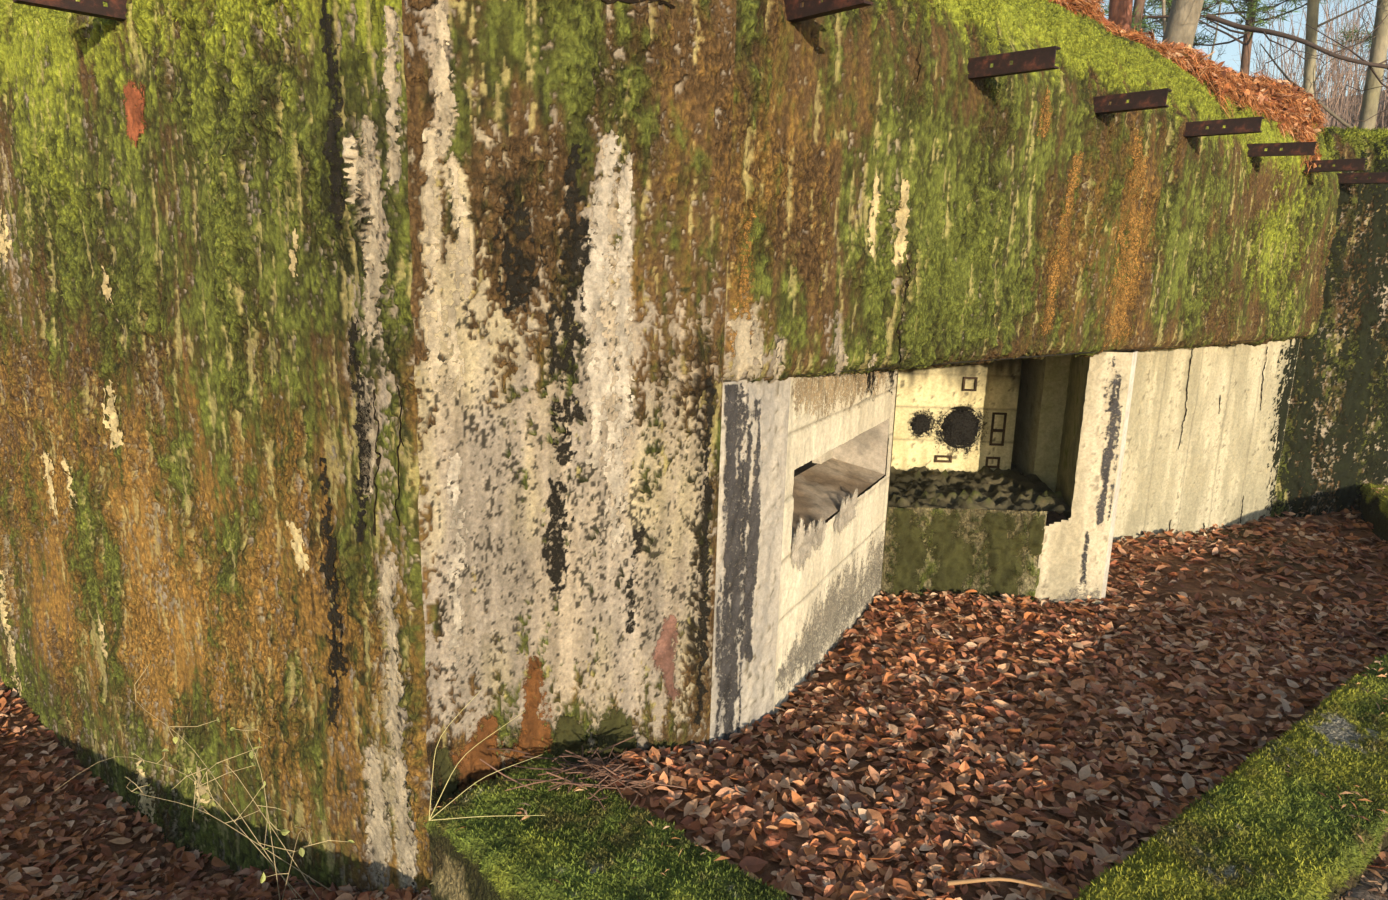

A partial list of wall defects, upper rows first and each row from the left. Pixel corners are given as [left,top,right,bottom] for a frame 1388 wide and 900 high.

corrosion [123,79,146,147]
crack [603,0,675,8]
damp [446,453,469,668]
damp [492,130,650,634]
damp [693,375,763,741]
damp [1055,356,1123,604]